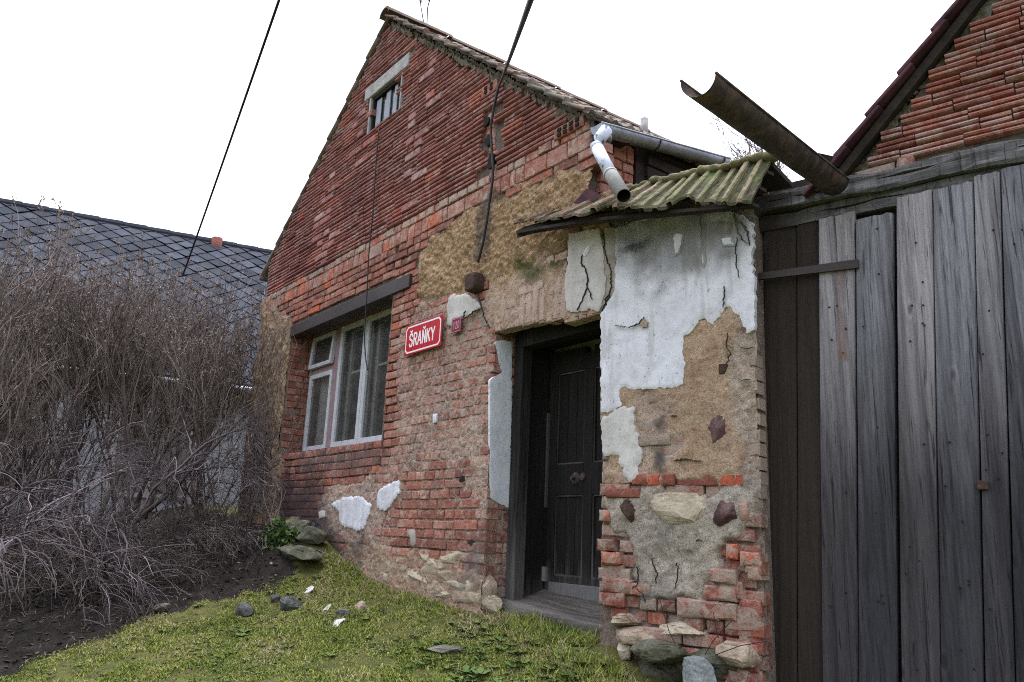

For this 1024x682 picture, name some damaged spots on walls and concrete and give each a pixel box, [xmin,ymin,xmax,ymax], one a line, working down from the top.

flaking render [447,293,483,327]
crack [577,233,612,311]
flaking render [564,211,757,482]
crack [722,211,750,308]